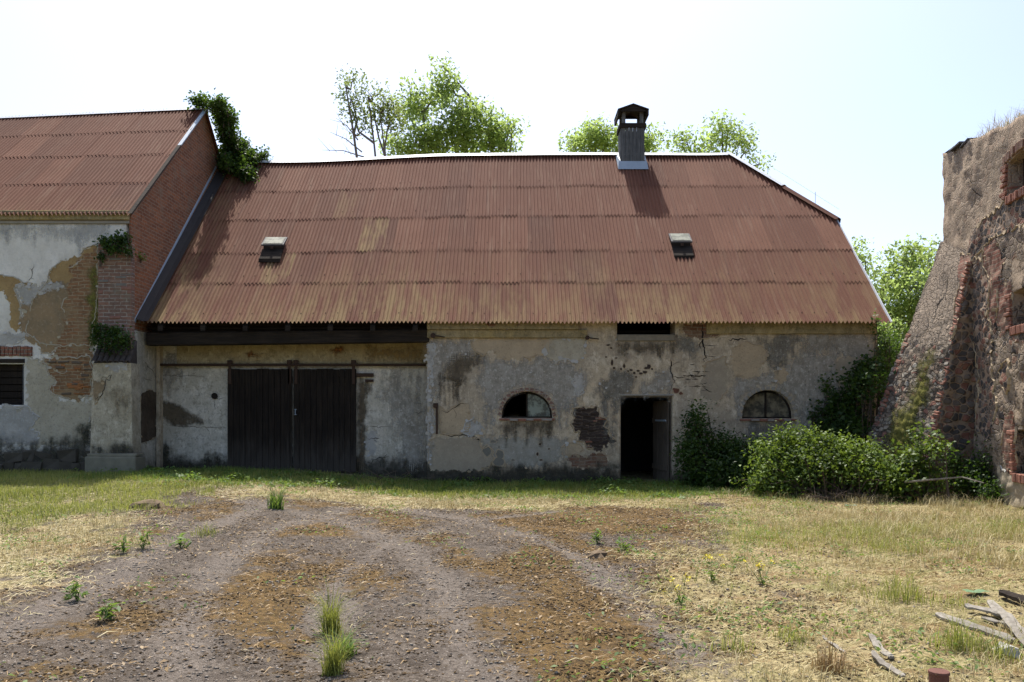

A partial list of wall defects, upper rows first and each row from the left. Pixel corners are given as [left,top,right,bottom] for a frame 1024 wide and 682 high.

flaking render [0,244,128,449]